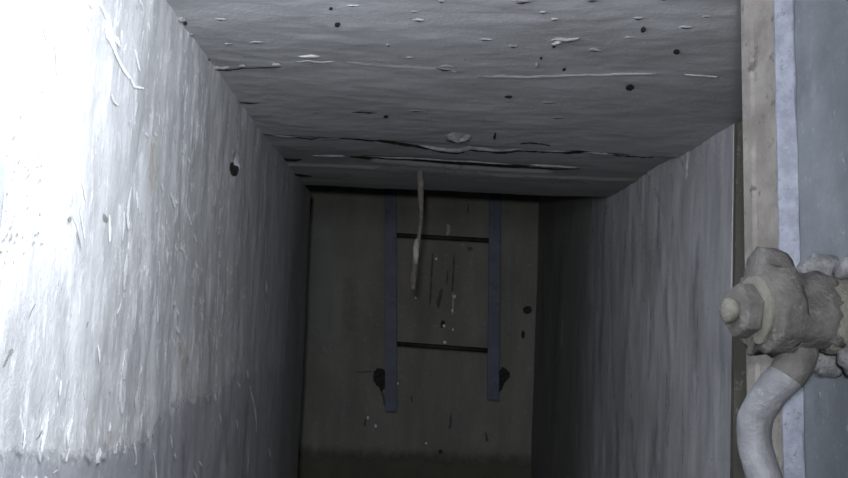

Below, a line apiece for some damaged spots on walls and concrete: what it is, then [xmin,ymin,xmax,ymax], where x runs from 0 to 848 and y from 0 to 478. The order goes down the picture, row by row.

spalling [550,37,580,48]
crack [265,134,653,158]
water stain [122,186,140,242]
water stain [118,348,128,414]
water stain [40,411,49,453]
water stain [297,451,531,478]